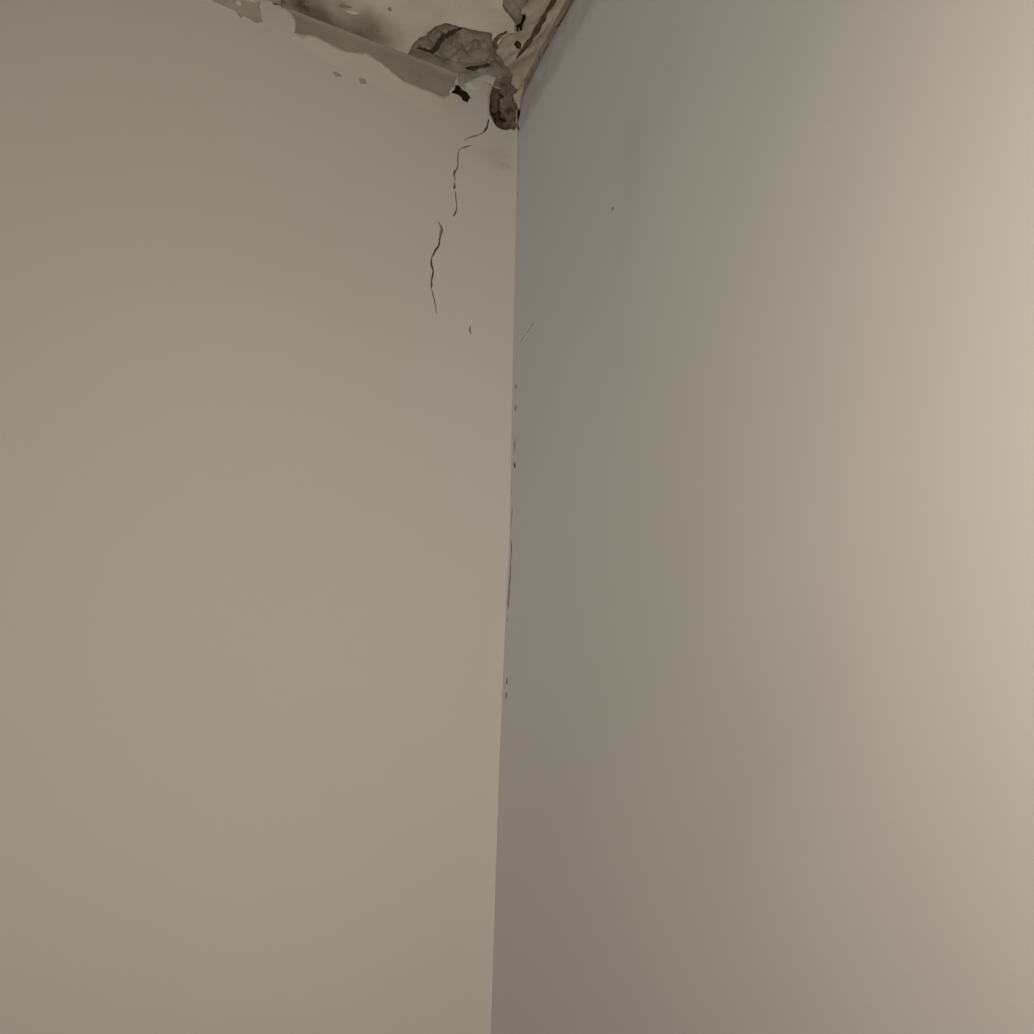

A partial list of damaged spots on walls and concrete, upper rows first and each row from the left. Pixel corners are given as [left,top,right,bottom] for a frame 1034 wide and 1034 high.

spalling [206,0,574,134]
crack [430,133,482,314]
crack [507,442,515,622]